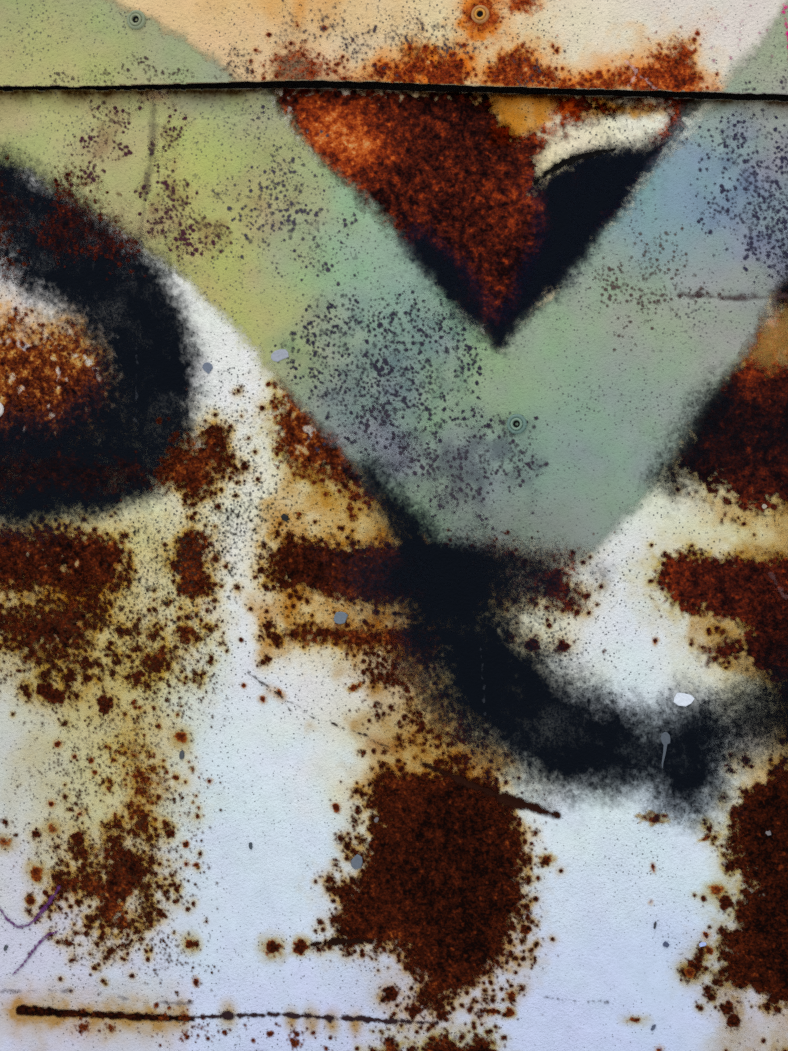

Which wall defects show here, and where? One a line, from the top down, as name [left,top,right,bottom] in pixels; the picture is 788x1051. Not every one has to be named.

rust [0,307,110,438]
rust [228,0,723,521]
rust [667,109,788,536]
rust [0,408,555,1051]
rust [505,550,603,654]
rust [643,813,668,823]
rust [648,544,788,701]
rust [677,728,788,1028]